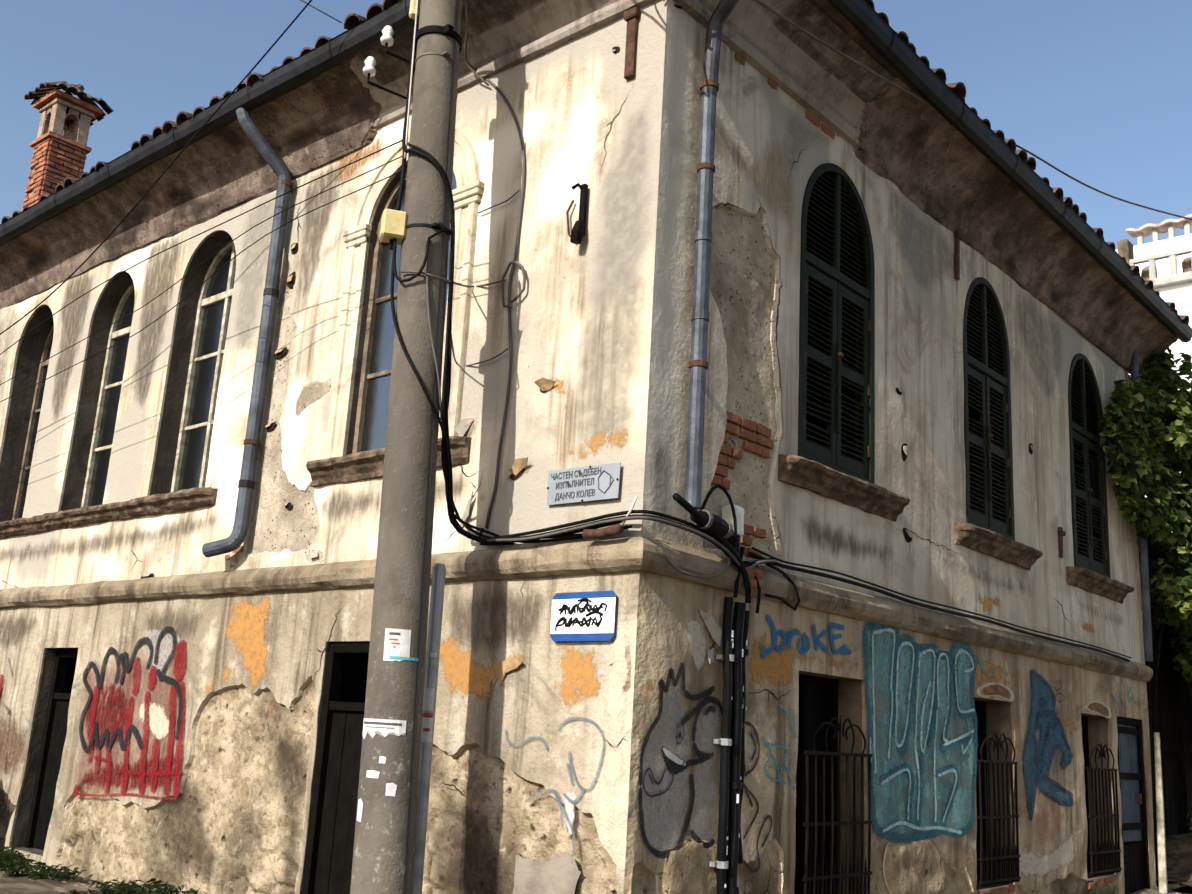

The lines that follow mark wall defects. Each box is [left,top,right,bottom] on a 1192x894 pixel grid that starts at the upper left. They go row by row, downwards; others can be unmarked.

crack [599,82,634,183]
damp [299,171,340,296]
damp [54,279,89,417]
damp [138,240,178,397]
flaking render [225,243,333,568]
flaking render [706,203,786,589]
damp [808,524,865,552]
flaking render [0,789,16,852]
flaking render [55,676,316,894]
flaking render [422,743,658,894]
flaking render [738,839,784,894]
flaking render [939,835,1122,894]